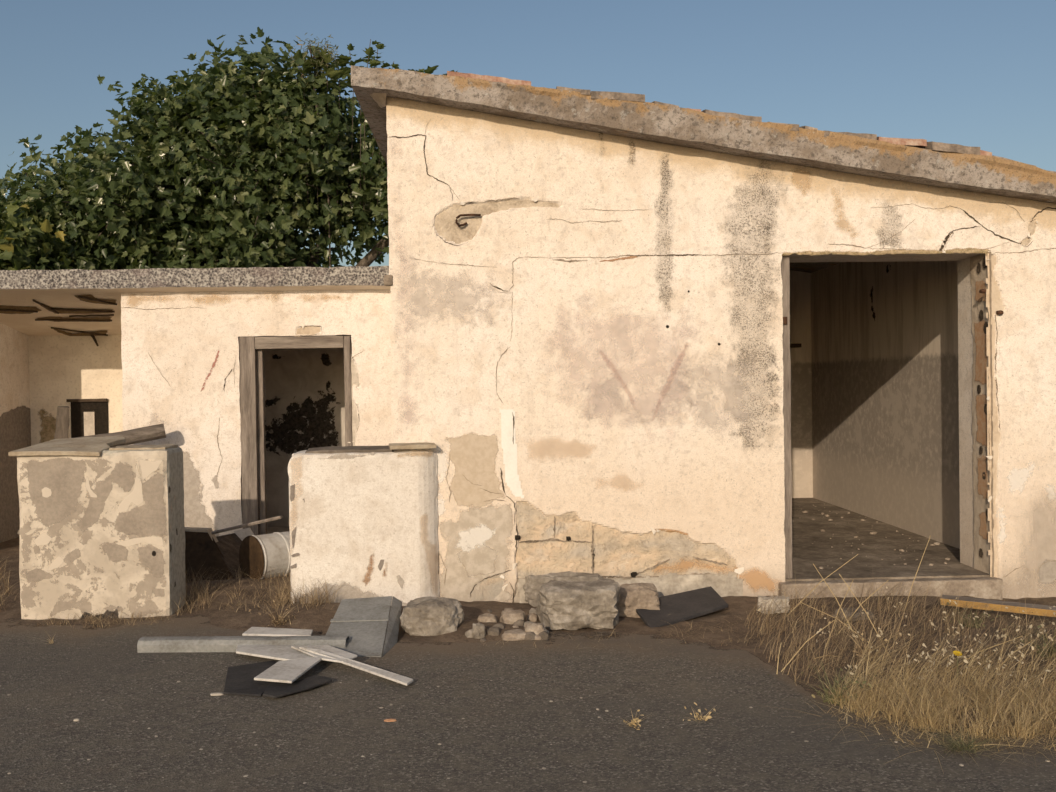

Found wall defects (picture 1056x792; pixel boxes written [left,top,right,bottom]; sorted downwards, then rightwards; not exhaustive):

crack [391,126,518,203]
crack [411,234,778,444]
leakage [655,160,672,307]
leakage [723,169,780,447]
spalling [783,248,1005,578]
crack [832,202,1056,253]
peeling [18,458,178,619]
flaking render [440,433,517,602]
crack [446,459,518,603]